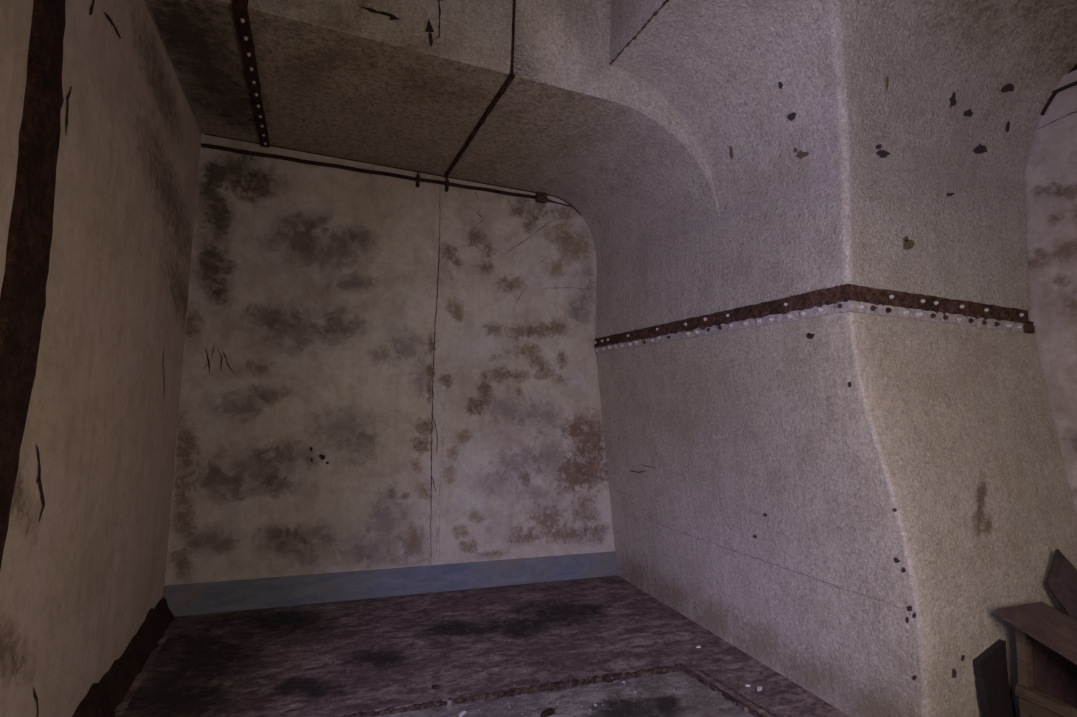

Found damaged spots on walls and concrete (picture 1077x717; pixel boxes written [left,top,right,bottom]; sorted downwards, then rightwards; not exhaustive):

damp [201,154,271,235]
crack [430,205,440,550]
damp [512,498,604,543]